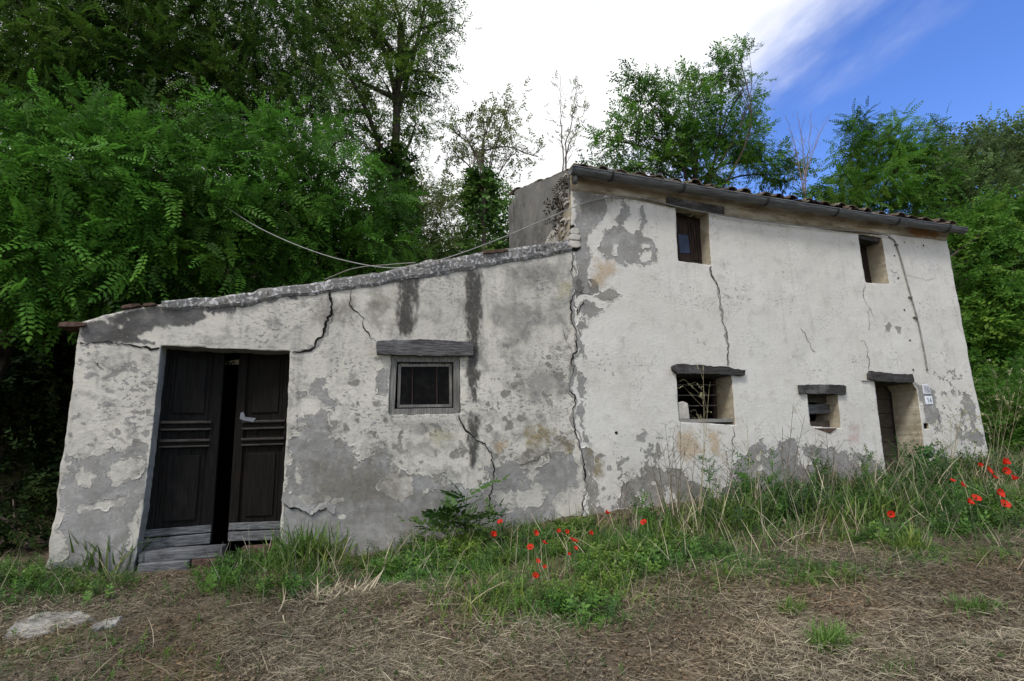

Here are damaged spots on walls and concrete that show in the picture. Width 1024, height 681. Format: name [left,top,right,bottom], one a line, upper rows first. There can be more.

crack [292,293,376,354]
water stain [396,278,419,335]
water stain [465,270,483,467]
crack [563,251,590,515]
peeling [283,173,885,556]
crack [709,266,730,366]
peeling [915,368,987,452]
peeling [48,401,151,575]
crack [458,415,547,528]